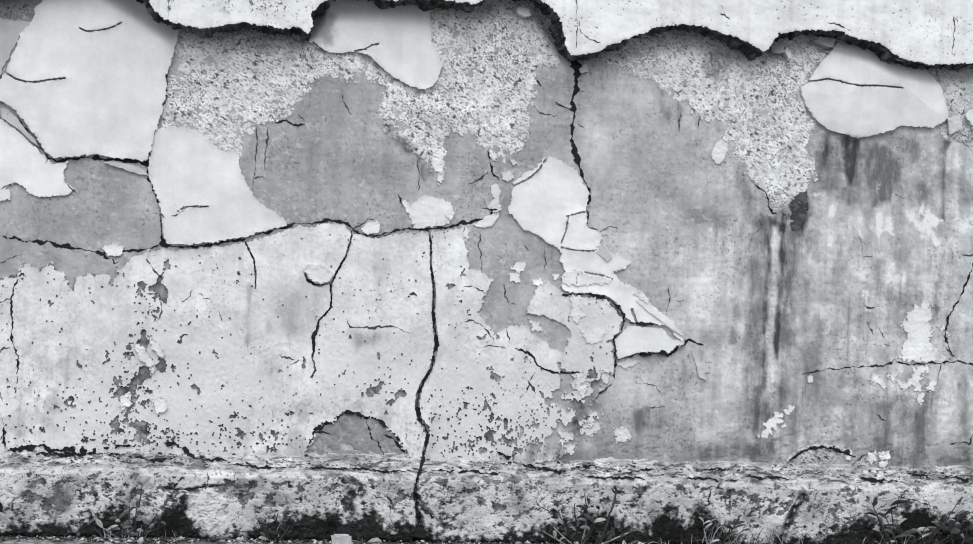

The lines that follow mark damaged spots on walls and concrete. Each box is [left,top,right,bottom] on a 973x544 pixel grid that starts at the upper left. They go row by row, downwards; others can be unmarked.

crack [536,0,617,232]
spalling [598,29,836,231]
spalling [926,65,973,146]
peeling [0,0,711,398]
damp [767,202,809,292]
damp [828,203,837,220]
damp [840,136,945,248]
crack [0,114,973,541]
damp [749,299,784,363]
peeling [867,300,950,406]
peeling [757,405,795,439]
spalling [779,442,891,471]